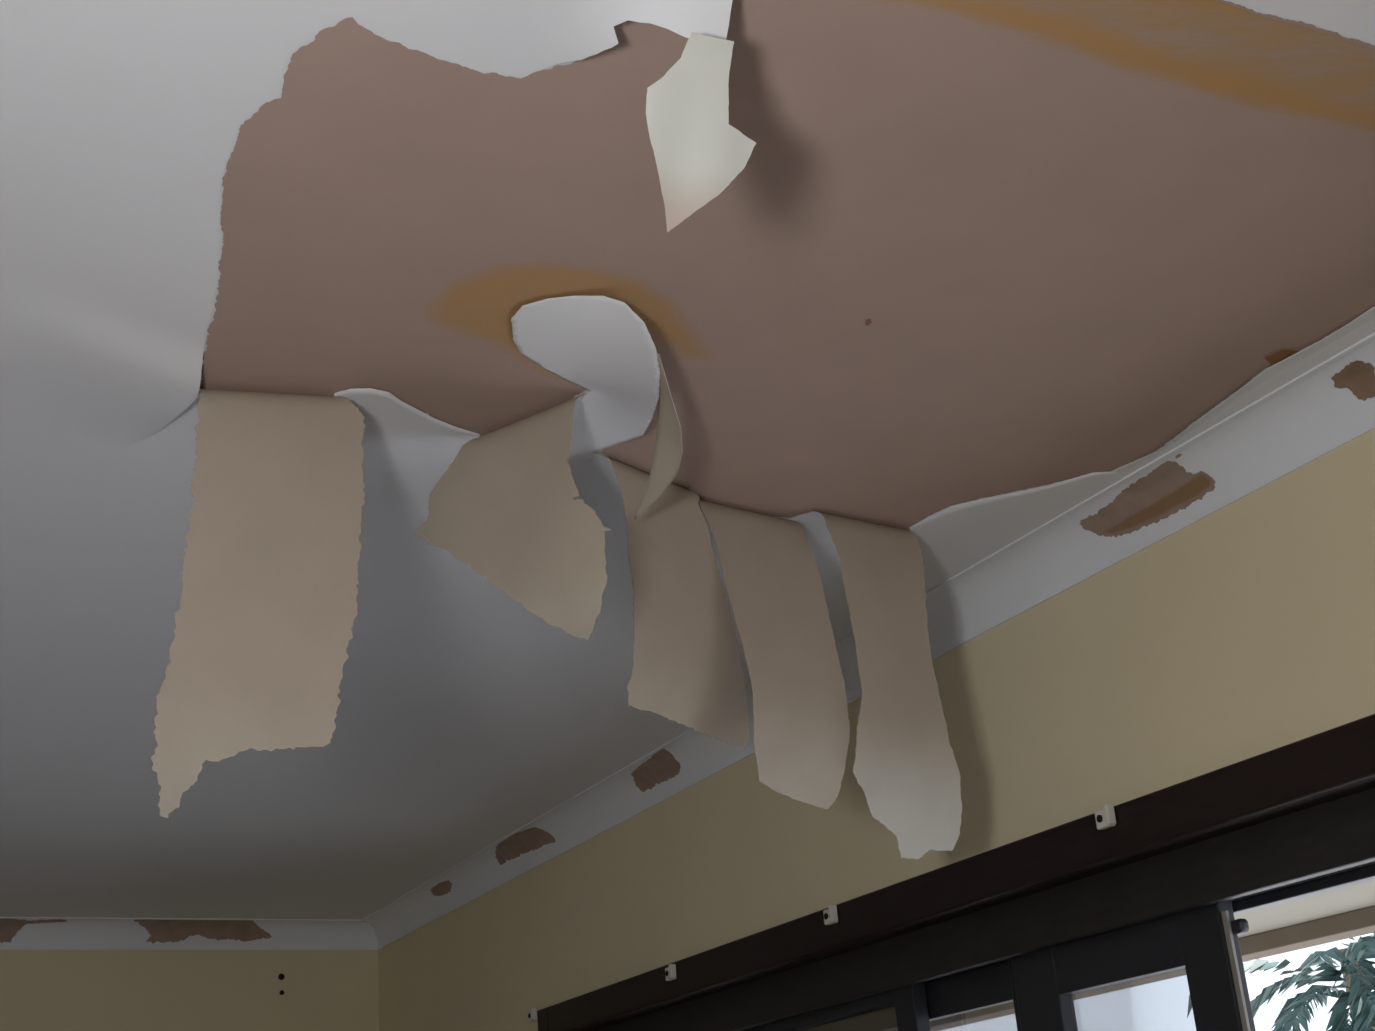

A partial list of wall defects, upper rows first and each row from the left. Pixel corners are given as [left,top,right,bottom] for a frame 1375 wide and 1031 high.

damp [806,0,1375,141]
damp [417,254,730,390]
peeling [151,0,1375,859]
peeling [495,827,556,865]
peeling [0,918,67,943]
peeling [133,919,272,944]